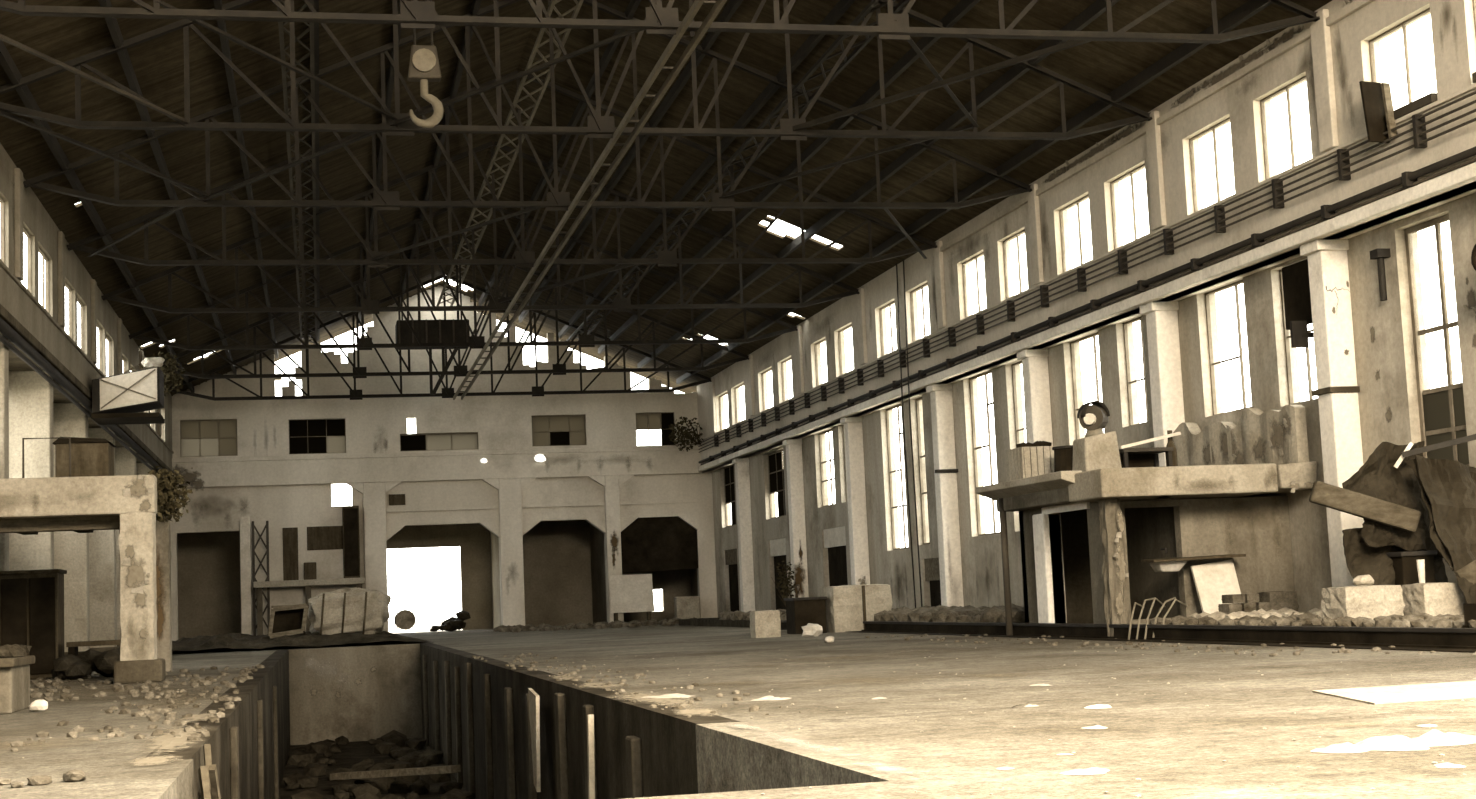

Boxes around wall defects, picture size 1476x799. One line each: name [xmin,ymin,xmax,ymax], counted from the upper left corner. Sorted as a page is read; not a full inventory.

flaking render [1203,414,1291,465]
spalling [122,474,154,511]
spalling [123,546,151,608]